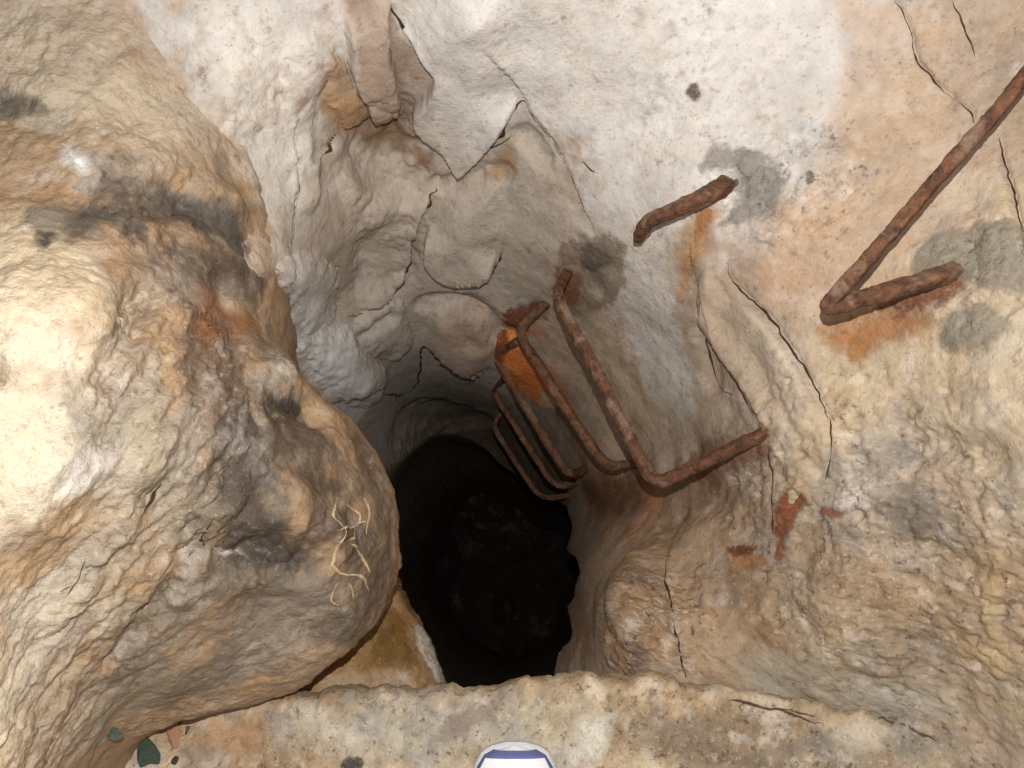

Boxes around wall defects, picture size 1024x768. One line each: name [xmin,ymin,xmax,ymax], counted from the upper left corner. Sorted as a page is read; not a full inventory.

crack [894,1,975,122]
crack [487,100,594,174]
water stain [37,193,255,300]
rust [679,207,720,293]
crack [999,139,1024,255]
rust [494,301,557,409]
crack [727,262,832,481]
rust [822,276,963,360]
rust [696,439,769,488]
rust [729,545,761,567]
rust [774,488,805,560]
crack [664,546,686,677]